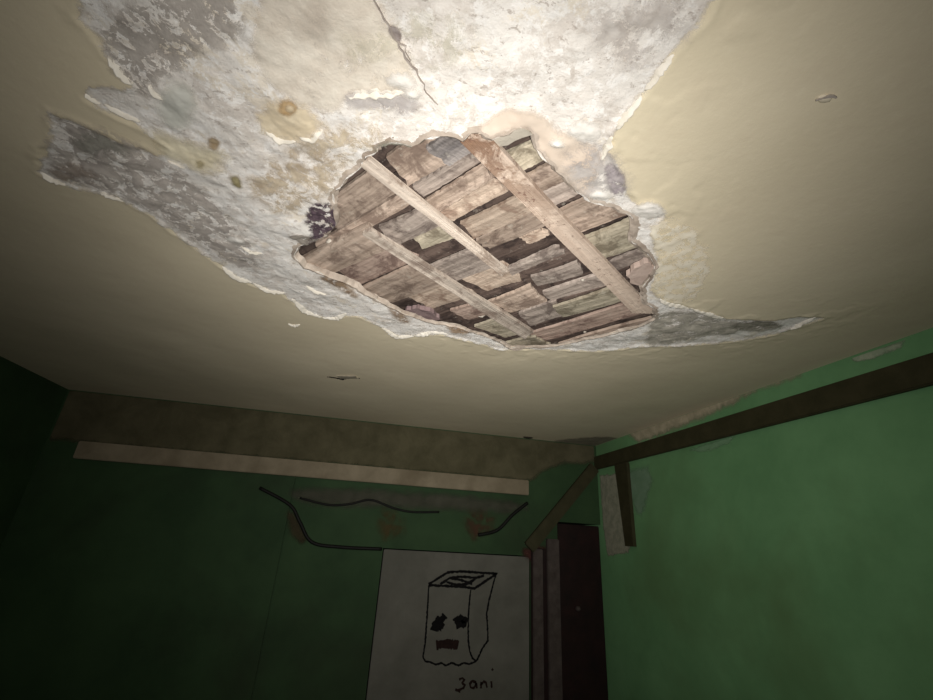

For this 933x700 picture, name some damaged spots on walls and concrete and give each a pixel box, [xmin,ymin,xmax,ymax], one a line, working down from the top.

crack [373,0,438,105]
water stain [50,122,254,266]
peeling [38,0,823,352]
water stain [646,312,781,345]
peeling [600,473,630,556]
peeling [630,468,651,513]